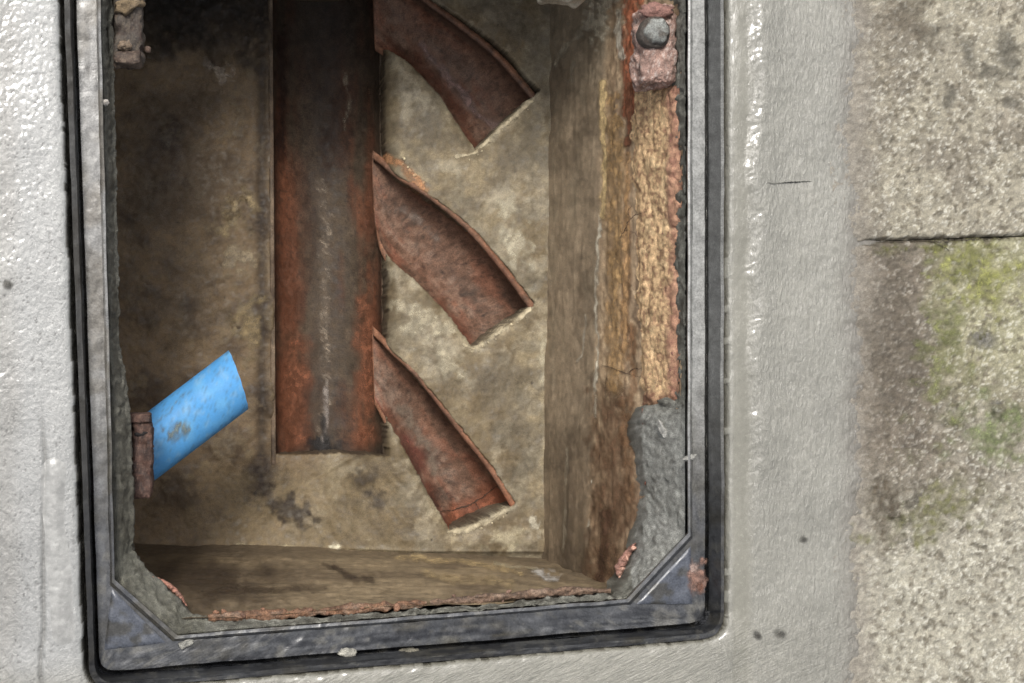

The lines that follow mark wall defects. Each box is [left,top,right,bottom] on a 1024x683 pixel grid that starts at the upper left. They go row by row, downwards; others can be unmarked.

corrosion [621,0,676,147]
corrosion [277,311,309,445]
corrosion [355,296,375,413]
corrosion [448,496,496,523]
spalling [614,543,637,578]
corrosion [688,558,706,592]